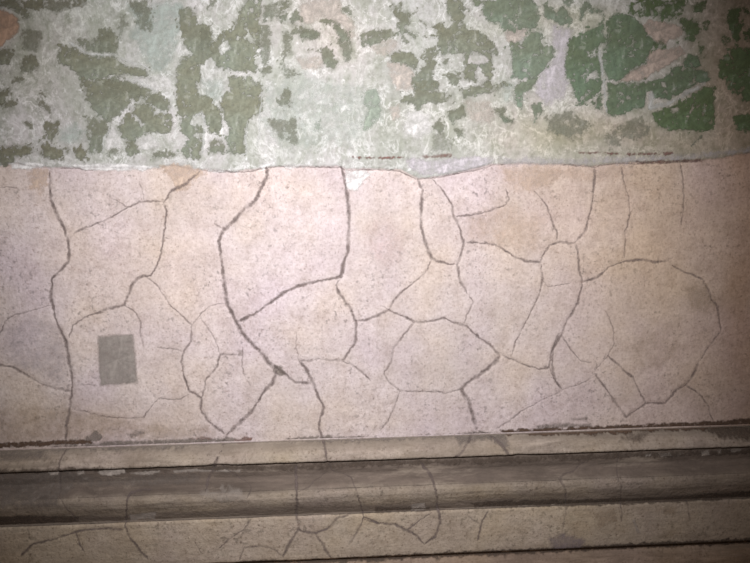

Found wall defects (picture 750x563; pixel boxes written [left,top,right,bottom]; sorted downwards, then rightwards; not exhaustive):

peeling [0,0,716,190]
peeling [719,7,750,101]
peeling [733,114,750,134]
crack [88,179,191,316]
crack [401,172,556,274]
crack [49,173,145,438]
crack [181,168,411,460]
crack [456,365,491,457]
crack [22,489,151,557]
crack [283,463,441,555]